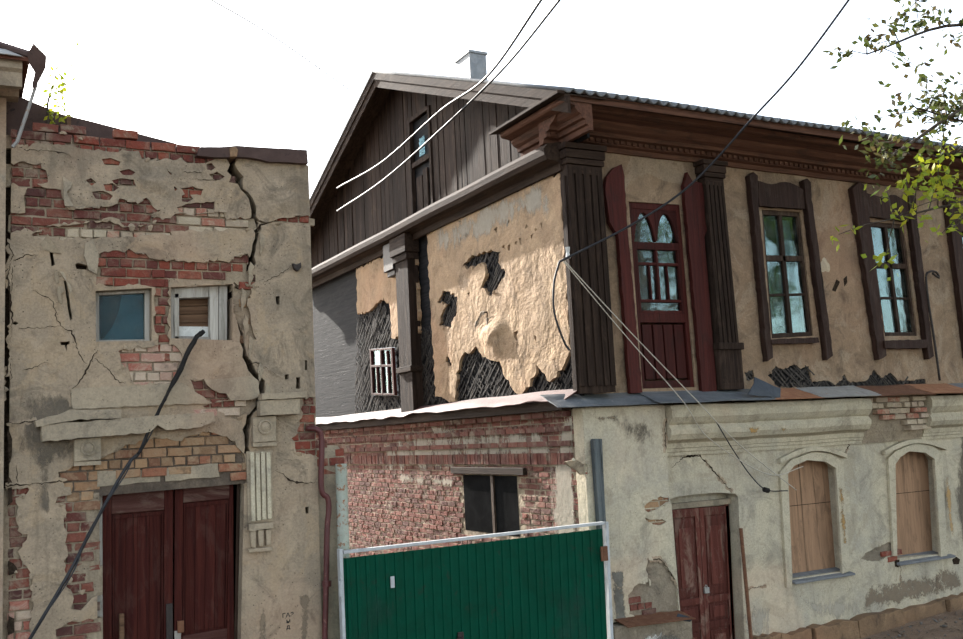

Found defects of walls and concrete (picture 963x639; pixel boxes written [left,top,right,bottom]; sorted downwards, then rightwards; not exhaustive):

crack [6,144,71,164]
spalling [6,122,315,385]
crack [4,188,125,506]
crack [227,214,292,393]
spalling [191,377,256,420]
spalling [861,394,932,430]
damp [946,437,963,534]
crack [7,613,15,635]
crack [8,561,18,575]
spalling [2,487,35,639]
spalling [56,430,247,639]
spalling [612,556,677,619]